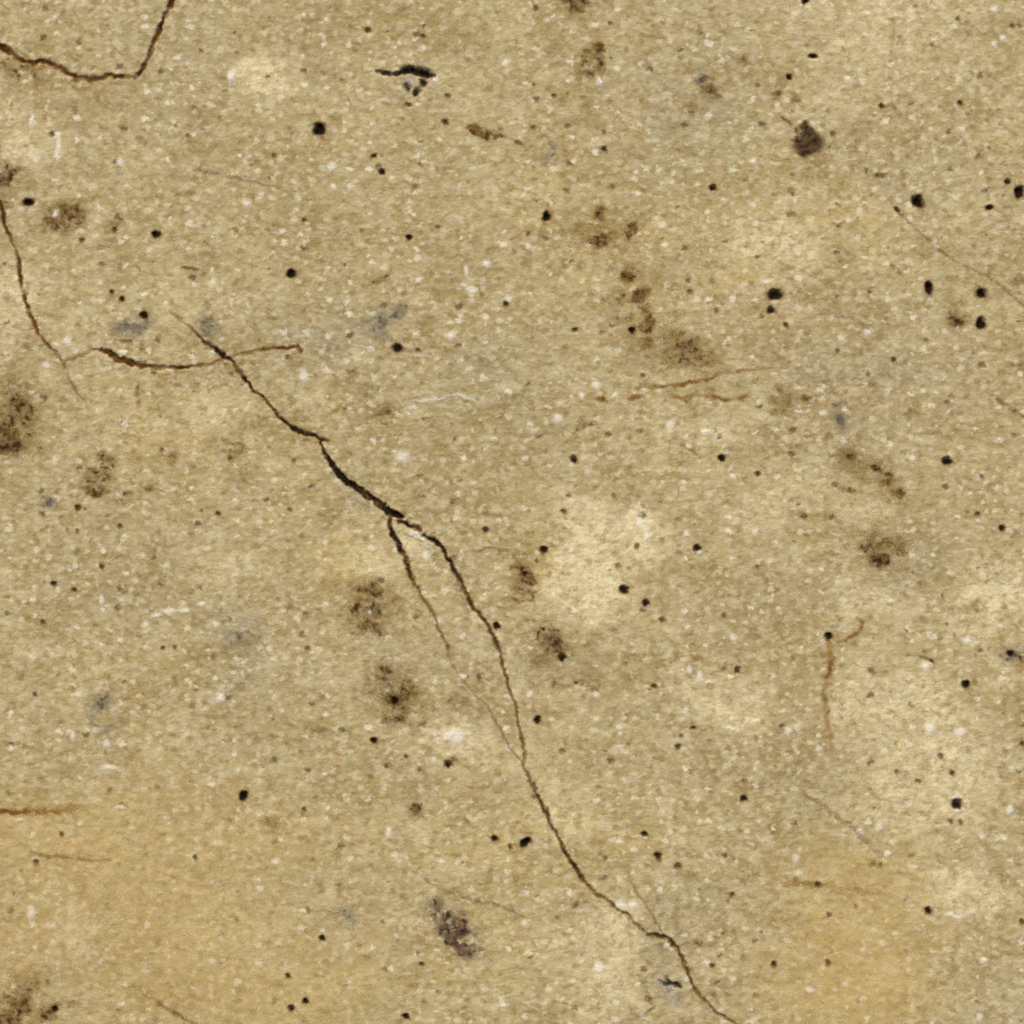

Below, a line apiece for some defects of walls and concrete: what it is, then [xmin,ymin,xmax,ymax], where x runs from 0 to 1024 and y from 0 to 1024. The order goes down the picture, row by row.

crack [0,0,175,83]
crack [0,200,65,365]
leakage [0,395,33,456]
crack [96,330,525,745]
leakage [860,538,898,567]
leakage [351,582,382,636]
leakage [380,666,414,722]
crack [527,773,729,1020]